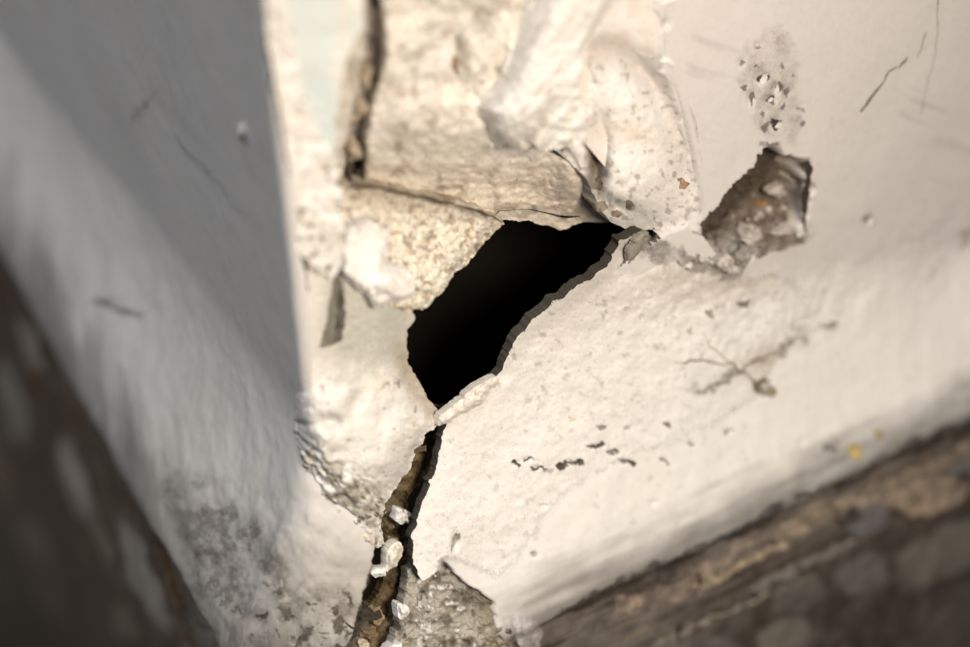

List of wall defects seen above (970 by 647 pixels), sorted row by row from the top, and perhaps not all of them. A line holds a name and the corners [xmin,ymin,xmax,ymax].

crack [343,0,502,222]
spalling [642,32,815,281]
crack [860,0,939,112]
spalling [260,0,611,647]
crack [674,311,777,397]
crack [736,299,750,307]
crack [820,321,838,329]
spalling [587,425,637,467]
peeling [176,507,238,606]
crack [346,403,445,647]